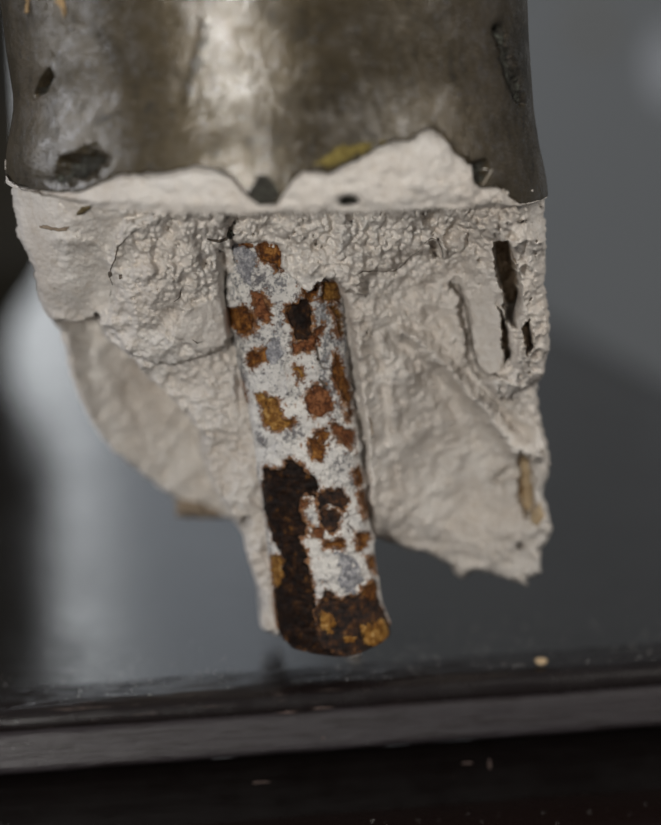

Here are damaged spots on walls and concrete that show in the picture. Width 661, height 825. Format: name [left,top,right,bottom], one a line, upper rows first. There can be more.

spalling [248,175,281,205]
rust [237,242,285,271]
spalling [495,241,519,303]
rust [228,291,272,335]
rust [244,346,267,367]
peeling [286,297,314,341]
spalling [500,315,510,360]
spalling [521,322,532,352]
rust [243,381,295,432]
rust [305,353,356,418]
rust [309,423,357,462]
peeling [261,459,391,657]